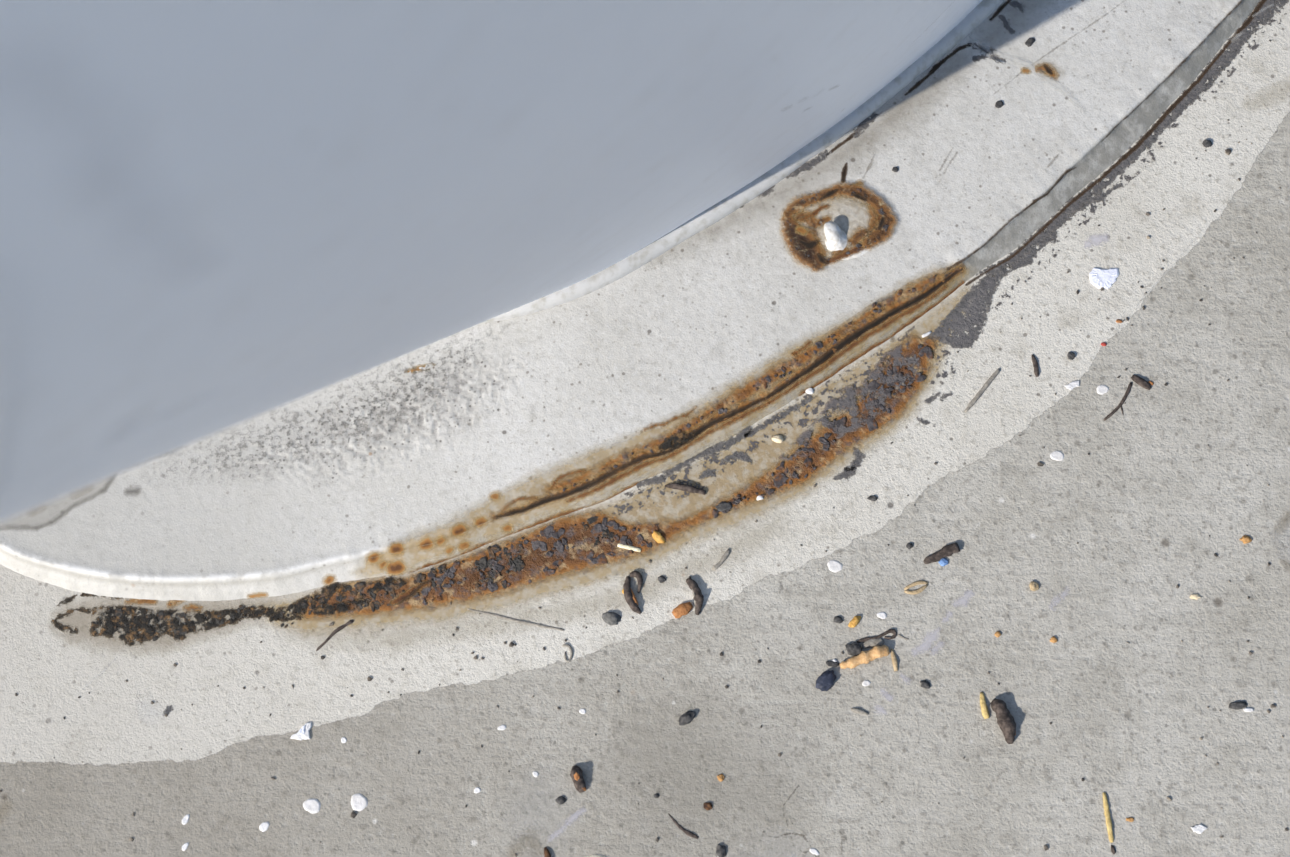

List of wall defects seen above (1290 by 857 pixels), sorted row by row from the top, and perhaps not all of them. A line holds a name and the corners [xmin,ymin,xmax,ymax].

rust [780,168,897,272]
peeling [925,0,1289,404]
rust [249,265,967,630]